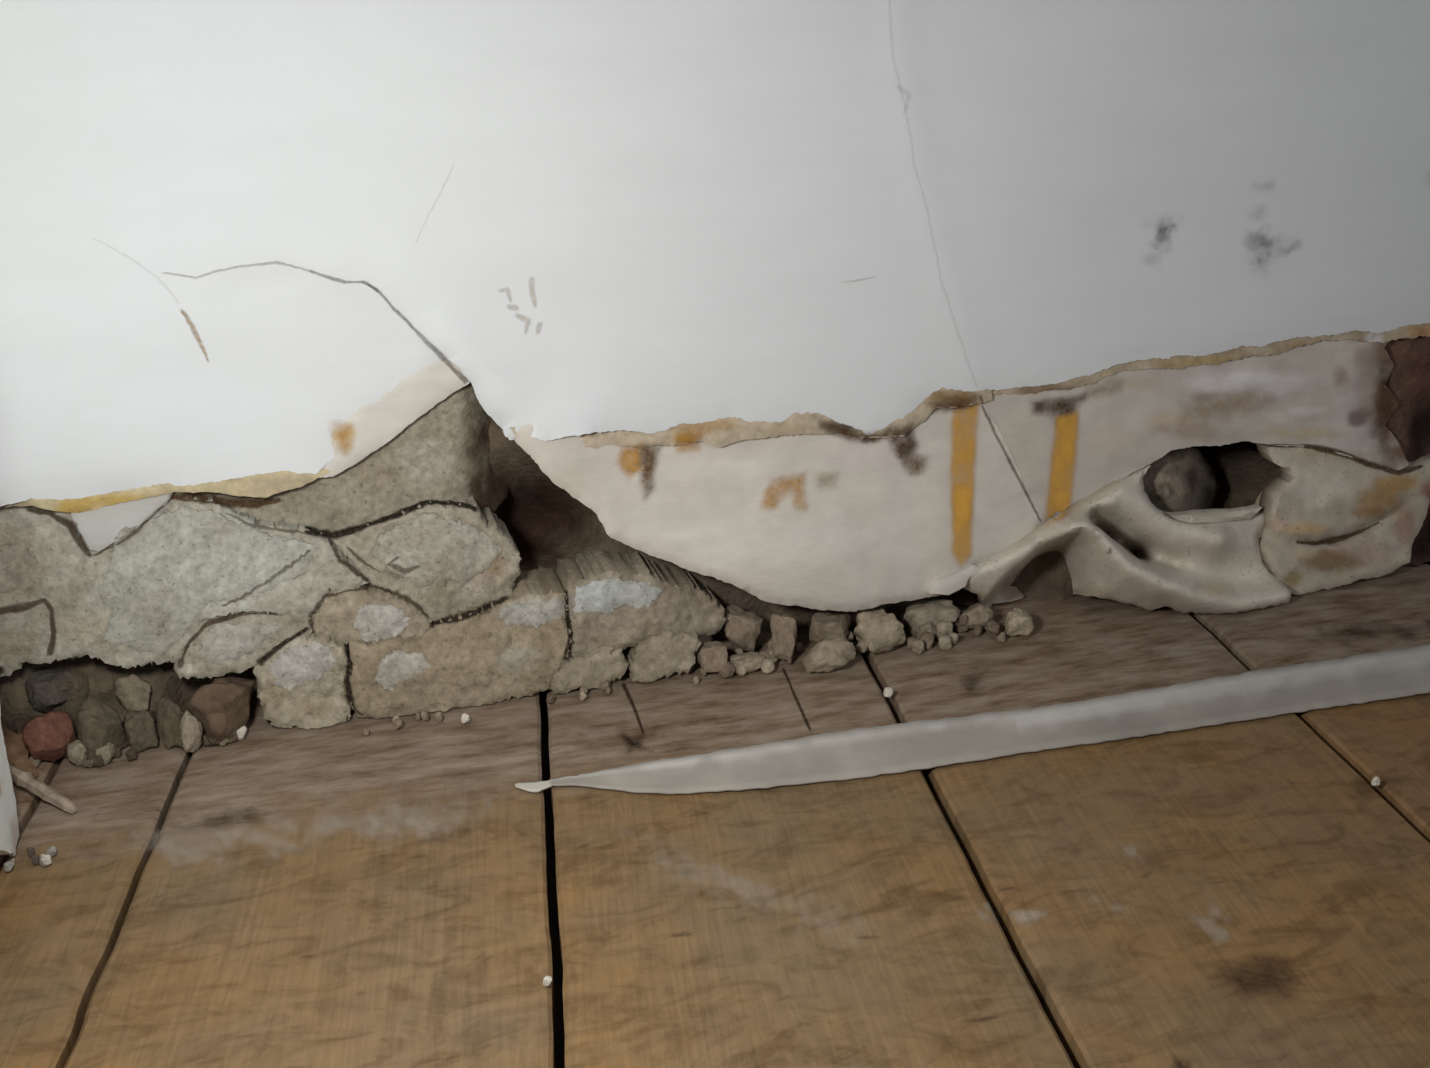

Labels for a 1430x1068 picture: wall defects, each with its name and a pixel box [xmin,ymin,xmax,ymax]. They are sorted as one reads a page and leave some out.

crack [312,272,375,289]
crack [181,310,208,360]
corrosion [1035,399,1076,416]
corrosion [621,448,655,489]
spalling [581,323,1430,595]
crack [980,397,1040,521]
spalling [0,359,726,729]